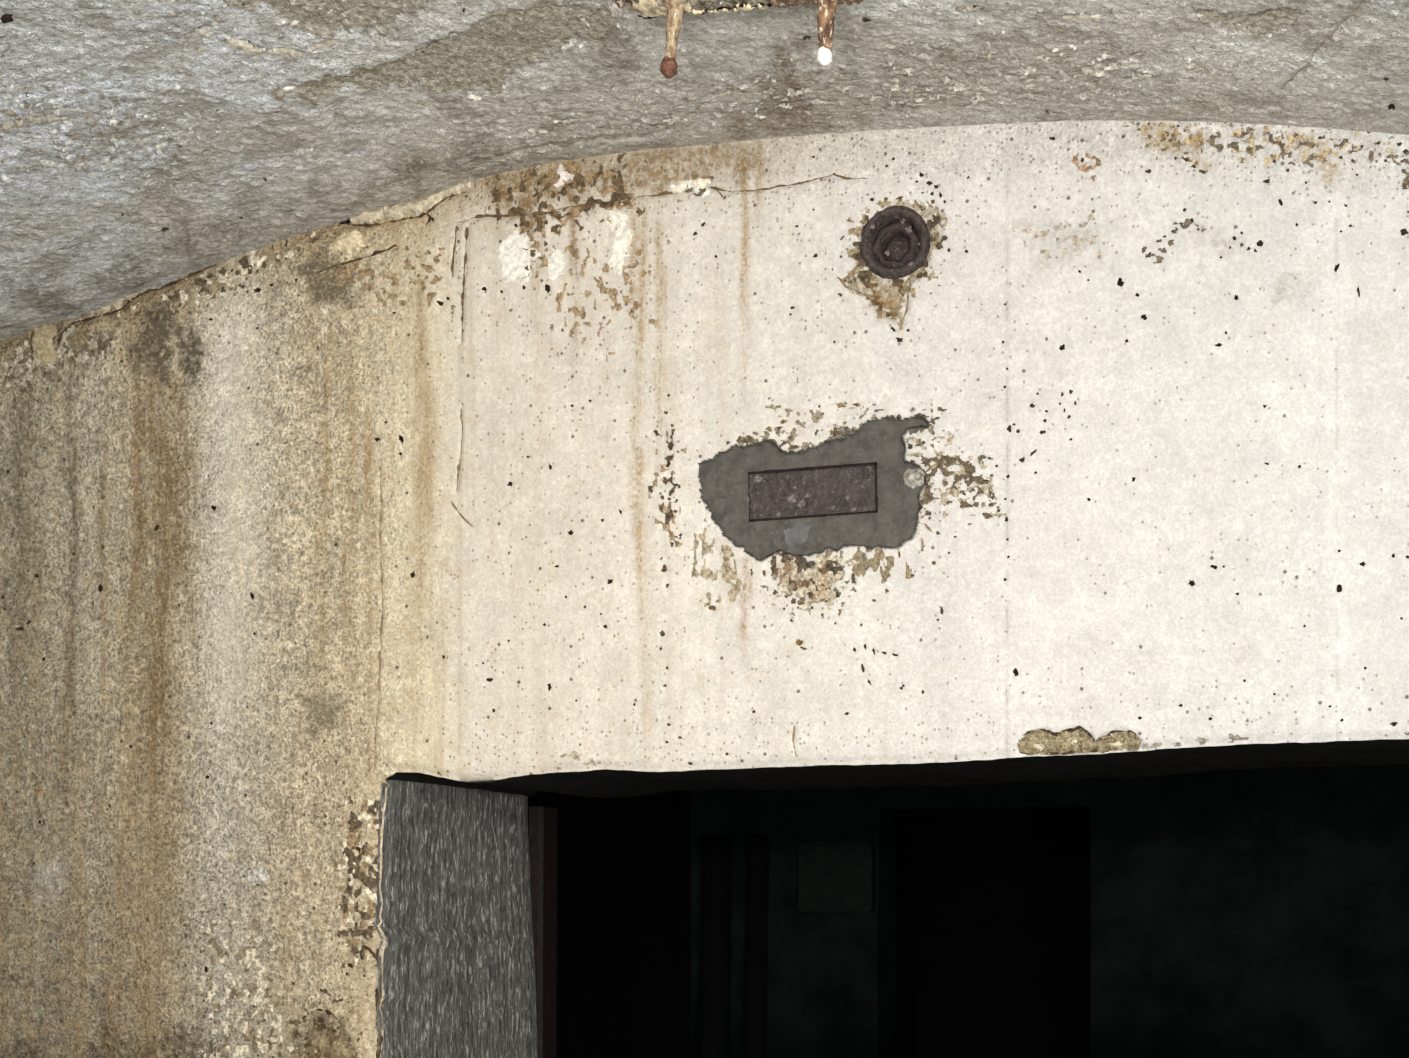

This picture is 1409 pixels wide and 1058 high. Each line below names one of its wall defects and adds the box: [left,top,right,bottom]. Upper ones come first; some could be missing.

corrosion [494,164,592,250]
corrosion [610,41,833,262]
leakage [128,300,204,381]
peeling [648,389,1077,625]
leakage [303,694,342,734]
spalling [326,793,383,983]